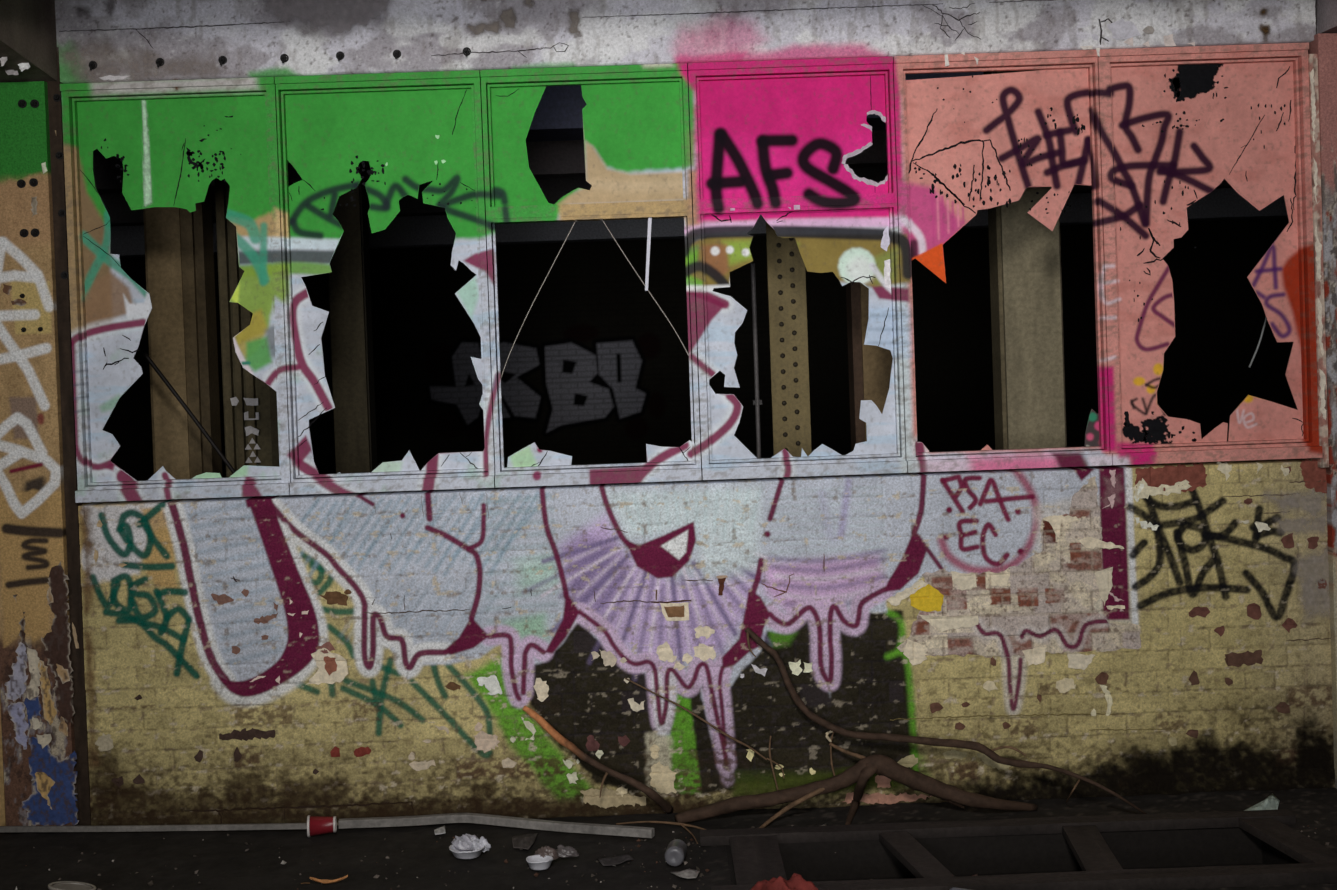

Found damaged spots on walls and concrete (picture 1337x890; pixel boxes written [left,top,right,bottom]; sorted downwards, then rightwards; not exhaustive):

crack [432,0,1053,58]
crack [436,89,518,191]
peeling [1310,69,1318,202]
peeling [1315,223,1326,420]
peeling [1135,518,1159,530]
spalling [1132,462,1232,502]
spalling [1281,459,1327,493]
spalling [887,470,1141,716]
peeling [5,561,79,826]
spalling [1225,650,1263,686]
damp [89,717,707,826]
damp [966,721,1335,800]